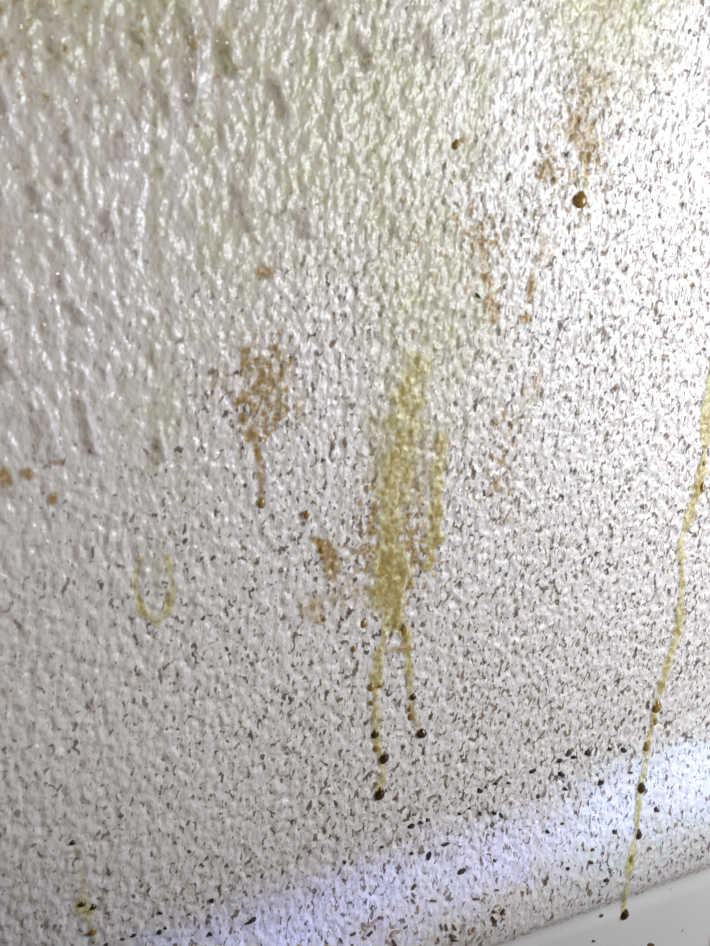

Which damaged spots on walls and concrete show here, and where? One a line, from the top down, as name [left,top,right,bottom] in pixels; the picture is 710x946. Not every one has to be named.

leakage [90,0,185,27]
leakage [291,0,433,189]
leakage [538,74,613,227]
leakage [555,0,663,62]
leakage [527,273,538,300]
leakage [345,198,513,801]
leakage [472,436,521,510]
leakage [621,372,710,920]